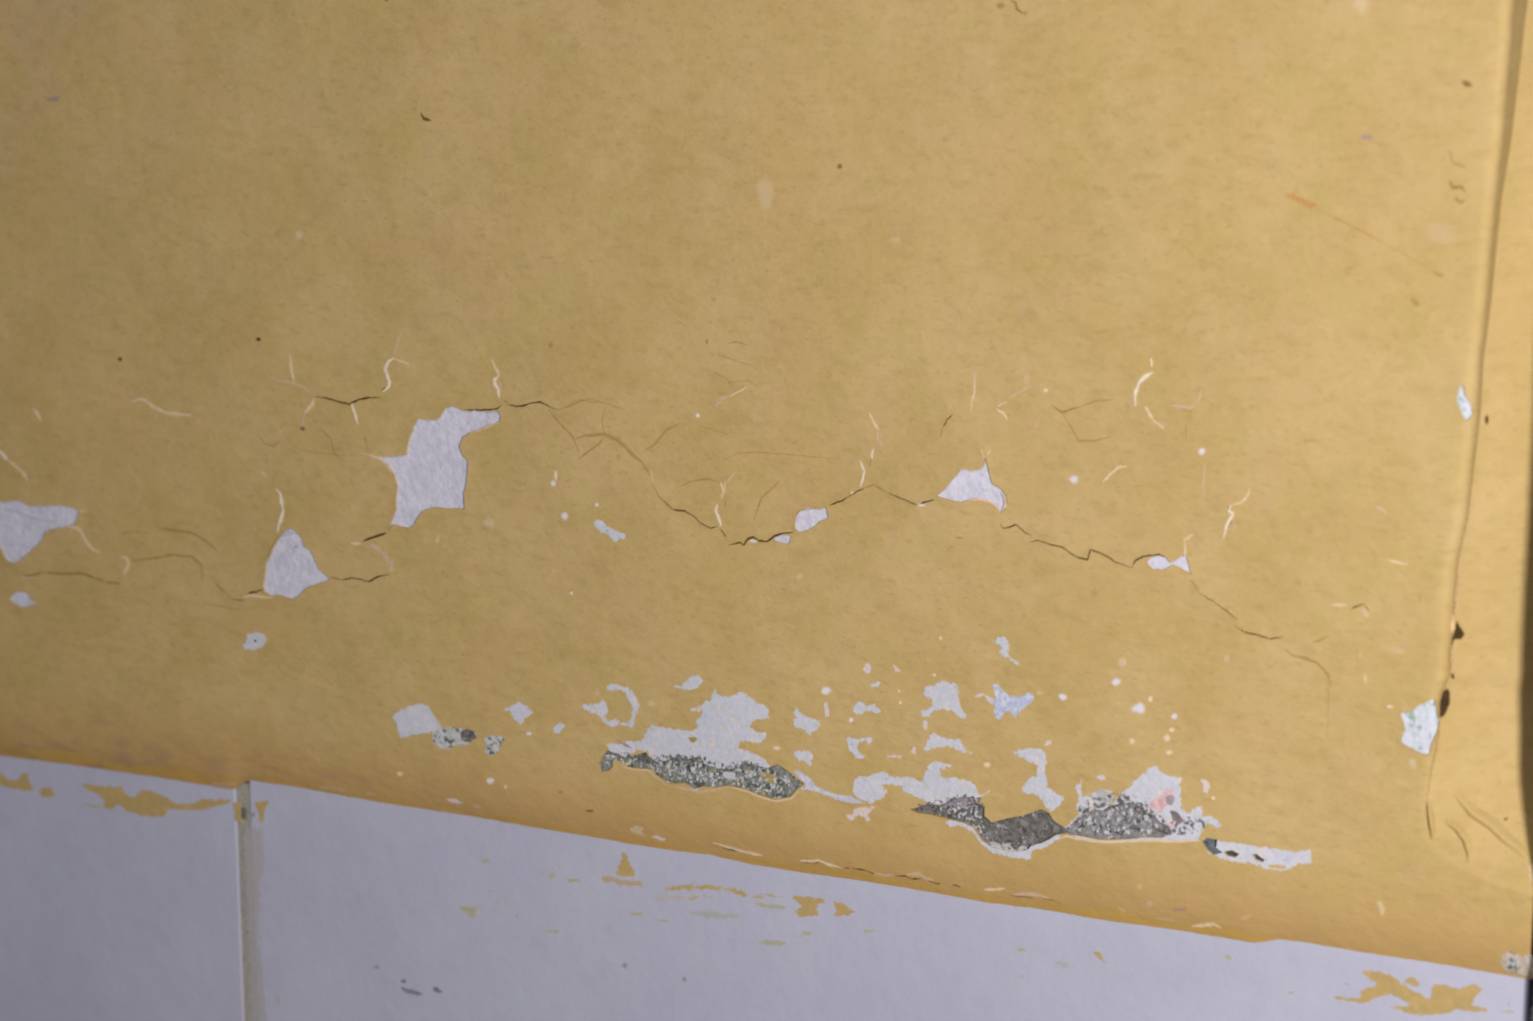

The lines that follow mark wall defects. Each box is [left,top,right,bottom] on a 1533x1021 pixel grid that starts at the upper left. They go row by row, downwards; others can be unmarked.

peeling [0,500,100,563]
crack [28,528,263,595]
peeling [243,528,330,599]
crack [259,330,410,532]
peeling [362,406,501,541]
crack [491,359,934,545]
peeling [918,449,1007,512]
crack [940,359,1201,483]
crack [1005,524,1161,563]
crack [1223,488,1250,538]
spalling [1387,574,1465,755]
flaking render [582,663,1312,871]